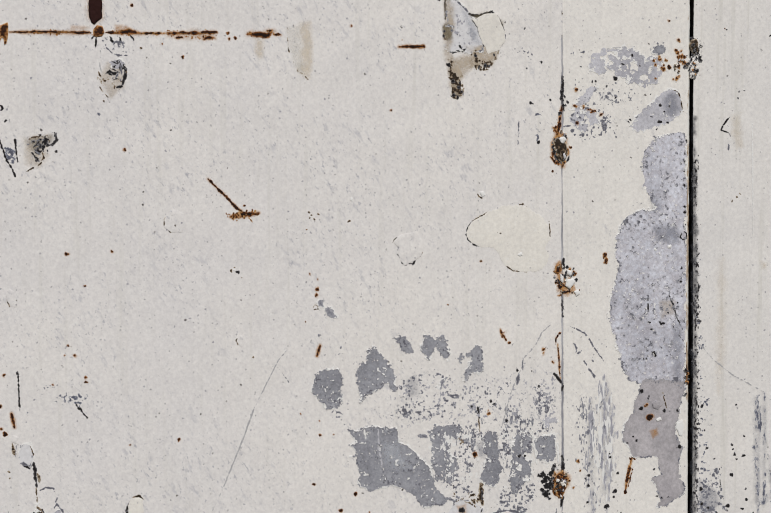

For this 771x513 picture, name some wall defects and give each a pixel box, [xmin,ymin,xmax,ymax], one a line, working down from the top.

peeling [97,36,128,102]
corrosion [0,0,237,47]
corrosion [247,30,281,50]
peeling [438,0,506,100]
peeling [0,139,18,177]
peeling [27,132,59,171]
corrosion [550,106,572,172]
corrosion [208,178,260,222]
corrosion [553,258,580,317]
peeling [563,42,689,513]
peeling [311,334,560,513]
corrosion [537,454,575,513]